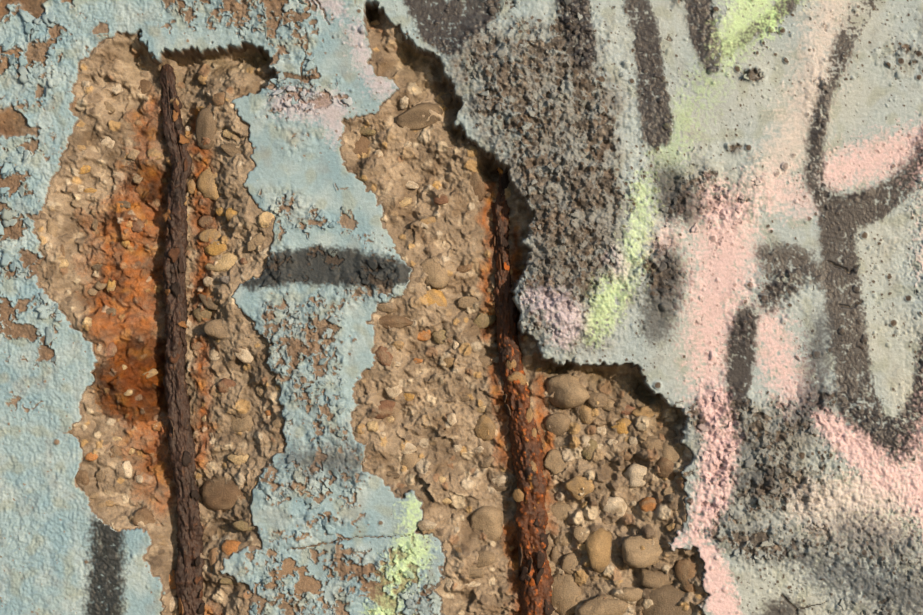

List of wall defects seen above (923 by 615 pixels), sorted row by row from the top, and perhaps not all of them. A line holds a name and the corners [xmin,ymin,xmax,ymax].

spalling [742,67,764,82]
rust [70,83,178,527]
rust [185,103,224,472]
spalling [0,0,687,615]
rust [473,180,516,476]
rust [509,221,527,296]
spalling [653,156,750,233]
rust [529,372,559,537]
spalling [519,336,846,615]
rust [204,595,225,615]
rust [500,519,522,615]
spalling [848,514,922,615]